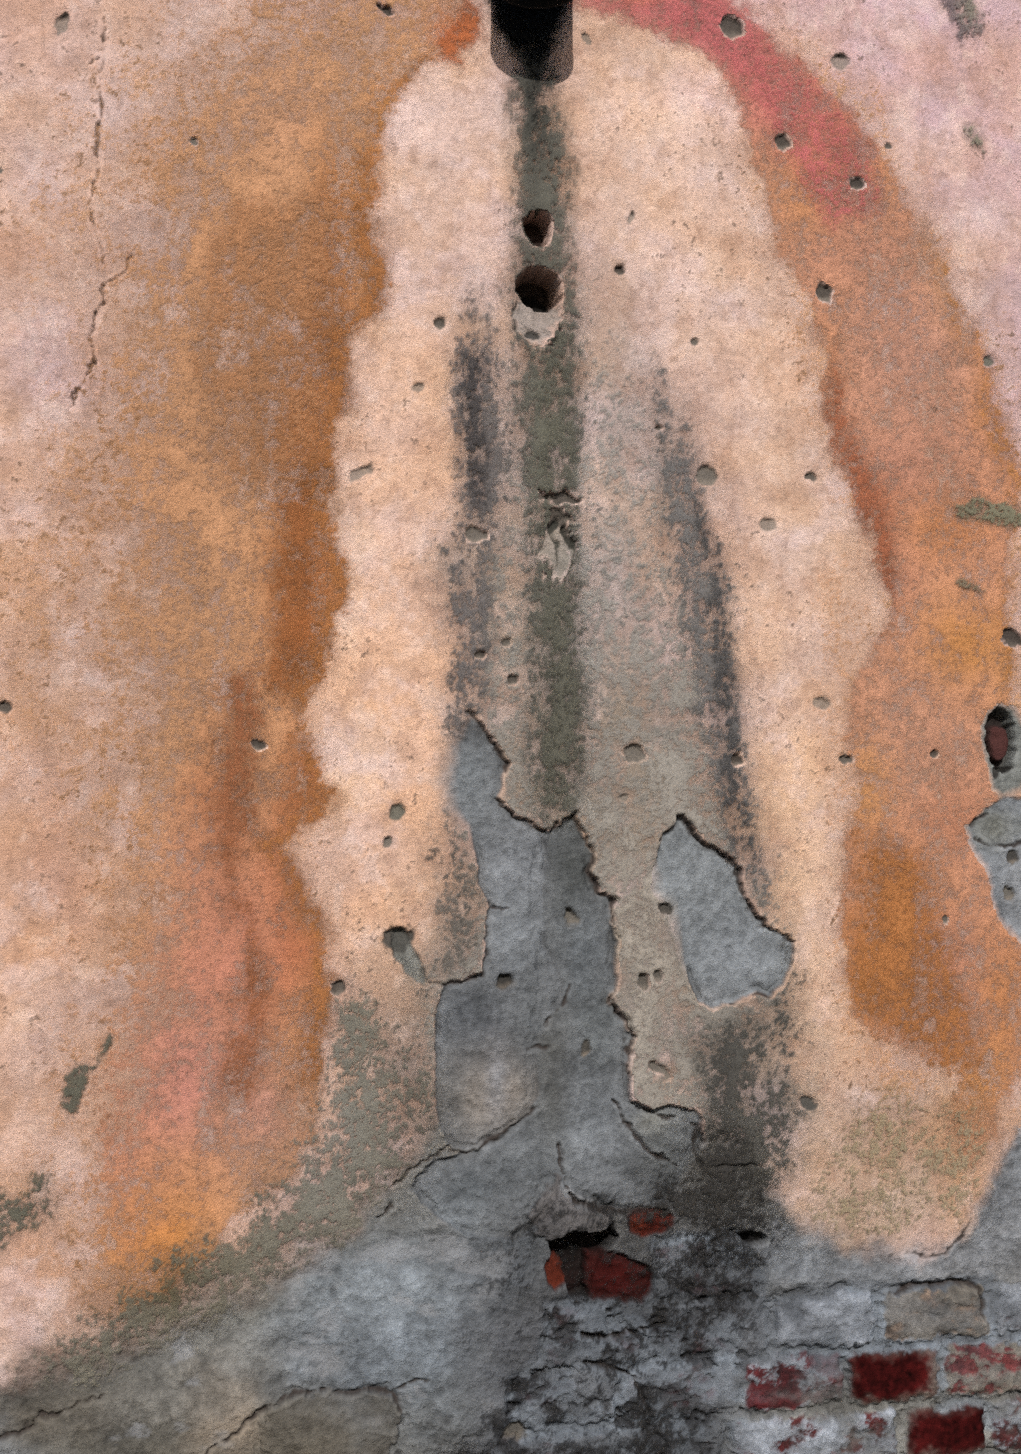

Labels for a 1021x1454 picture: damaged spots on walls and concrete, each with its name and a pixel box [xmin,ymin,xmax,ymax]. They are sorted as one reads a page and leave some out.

crack [69,11,138,414]
hole [0,700,23,717]
spalling [247,734,268,753]
damp [440,0,806,1454]
spalling [380,799,411,851]
hole [325,973,352,1004]
damp [26,821,487,1391]
spalling [407,691,1021,1454]
crack [0,1391,111,1446]
crack [201,1376,435,1454]